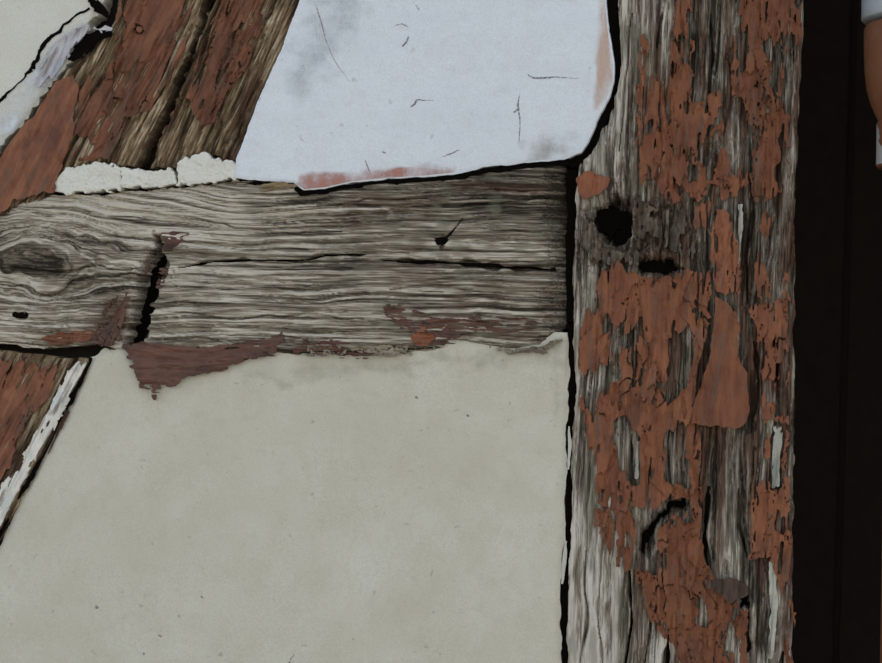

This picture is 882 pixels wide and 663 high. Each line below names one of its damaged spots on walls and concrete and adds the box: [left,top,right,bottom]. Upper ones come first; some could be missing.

peeling [0,0,194,213]
peeling [186,0,265,127]
crack [596,205,633,245]
peeling [41,292,285,400]
crack [133,0,622,663]
peeling [293,303,536,359]
peeling [576,0,802,663]
peeling [0,358,87,526]
crack [641,486,711,566]
crack [624,570,633,663]
crack [663,634,671,663]
crack [740,596,751,653]